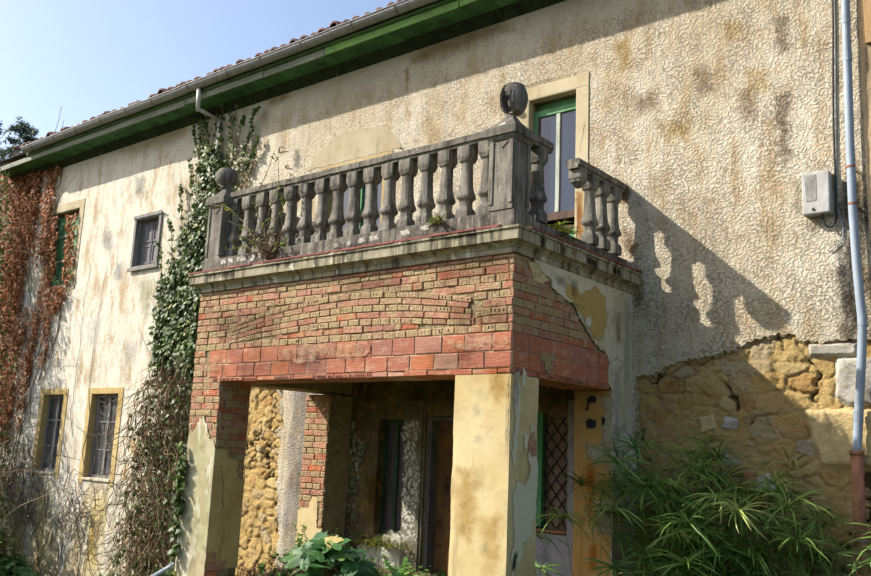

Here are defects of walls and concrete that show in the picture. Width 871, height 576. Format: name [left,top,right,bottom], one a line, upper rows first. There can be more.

spalling [189,253,607,576]
peeling [585,395,616,466]
spalling [634,332,871,576]